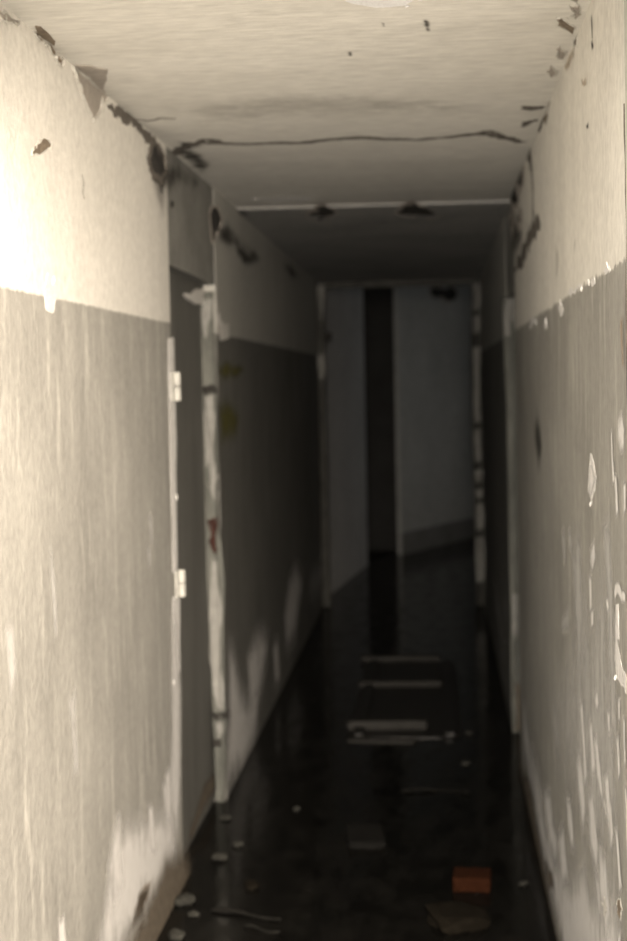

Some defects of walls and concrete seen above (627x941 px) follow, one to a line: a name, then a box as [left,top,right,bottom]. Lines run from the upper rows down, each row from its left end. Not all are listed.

spalling [33,26,109,123]
spalling [545,0,582,78]
spalling [147,135,168,188]
crack [107,103,546,274]
peeling [44,274,56,313]
peeling [504,298,515,337]
peeling [558,262,611,317]
peeling [588,453,596,507]
water stain [228,567,301,773]
peeling [614,604,627,693]
water stain [519,534,627,941]
water stain [102,638,190,941]